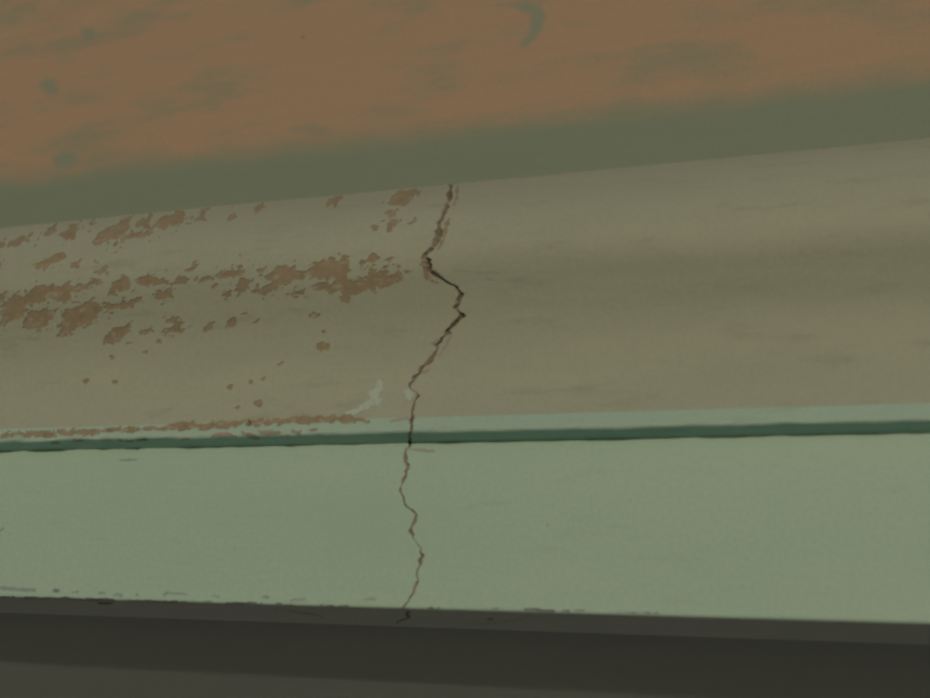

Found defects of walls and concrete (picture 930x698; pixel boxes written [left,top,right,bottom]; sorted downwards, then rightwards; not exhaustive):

peeling [0,207,211,249]
spalling [371,188,422,233]
peeling [0,253,411,360]
peeling [0,400,370,444]
crack [389,183,466,624]